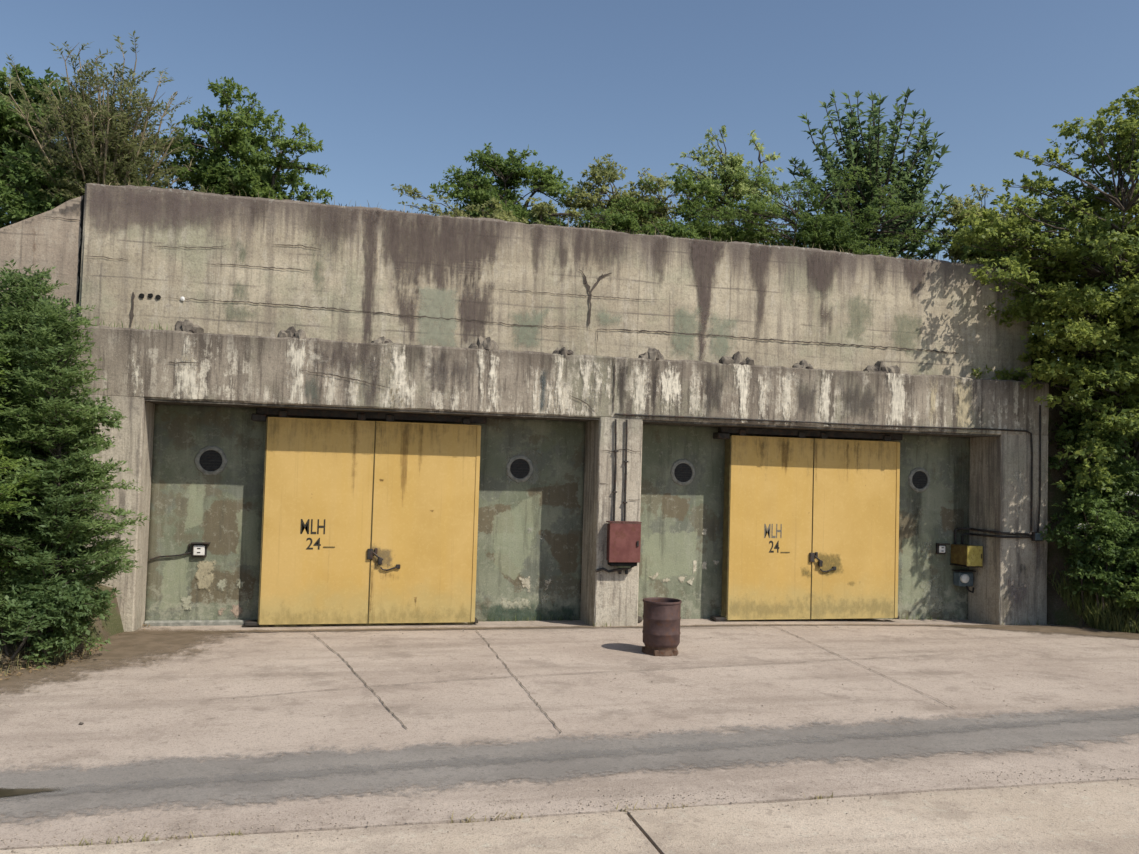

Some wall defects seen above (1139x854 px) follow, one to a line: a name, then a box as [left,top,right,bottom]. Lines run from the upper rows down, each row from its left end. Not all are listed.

water stain [177,338,198,399]
spalling [175,319,204,333]
water stain [287,343,377,405]
water stain [350,210,499,412]
crack [130,270,959,414]
water stain [533,356,723,415]
water stain [691,239,724,361]
water stain [734,364,766,423]
water stain [750,244,772,341]
water stain [782,373,874,422]
water stain [886,373,905,425]
peeling [181,560,250,617]